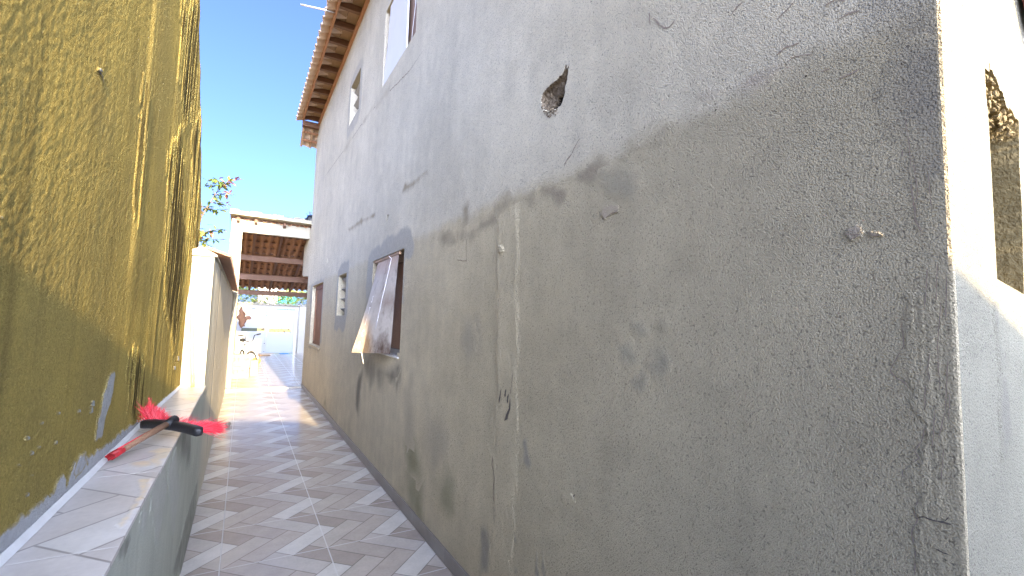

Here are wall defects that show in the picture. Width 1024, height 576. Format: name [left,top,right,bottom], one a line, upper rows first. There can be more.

spalling [533,40,577,136]
leakage [432,118,677,250]
peeling [93,370,116,442]
crack [916,516,951,525]